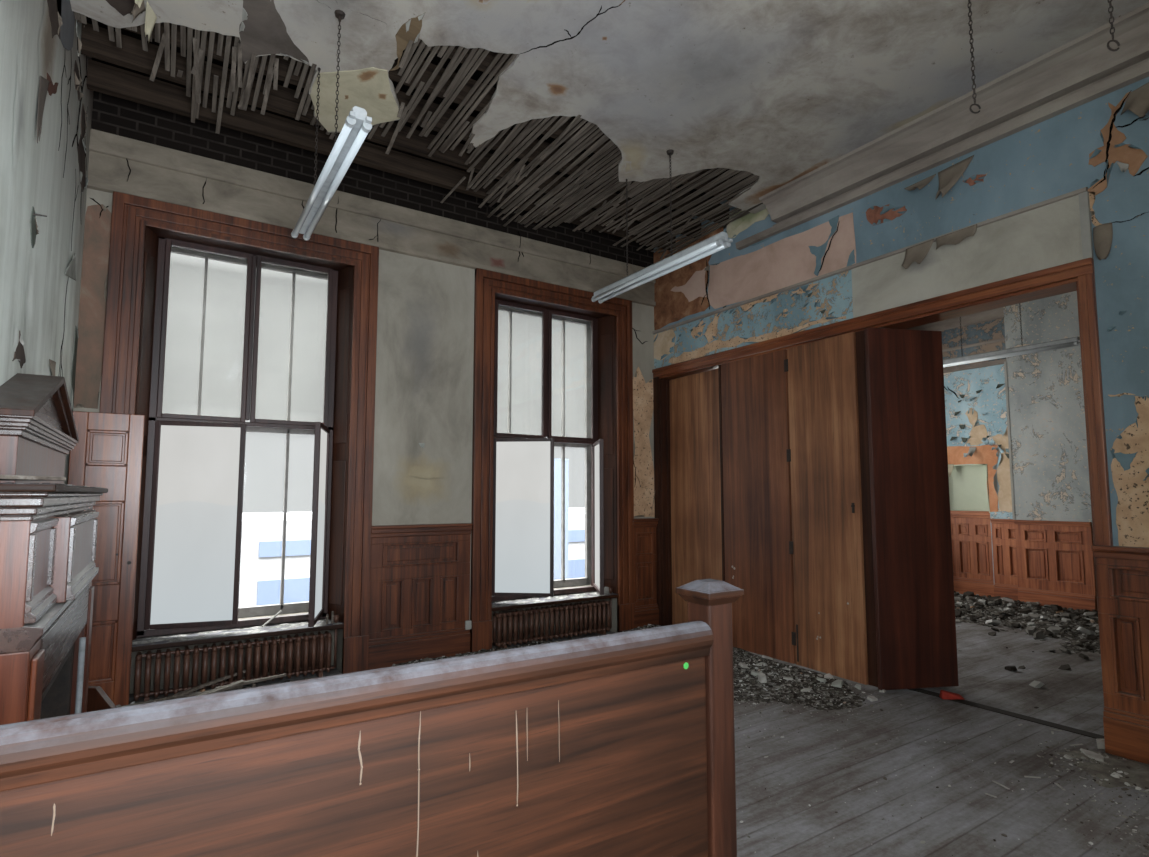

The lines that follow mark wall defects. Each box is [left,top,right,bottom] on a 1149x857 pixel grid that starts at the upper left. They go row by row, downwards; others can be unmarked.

peeling [37,73,59,143]
peeling [47,0,88,192]
spalling [106,0,143,16]
peeling [239,0,400,132]
crack [520,0,625,54]
spalling [1088,92,1148,260]
crack [1094,90,1149,187]
peeling [12,331,26,368]
spalling [64,204,112,412]
peeling [653,204,907,364]
spalling [947,390,1012,512]
spalling [1110,396,1149,548]